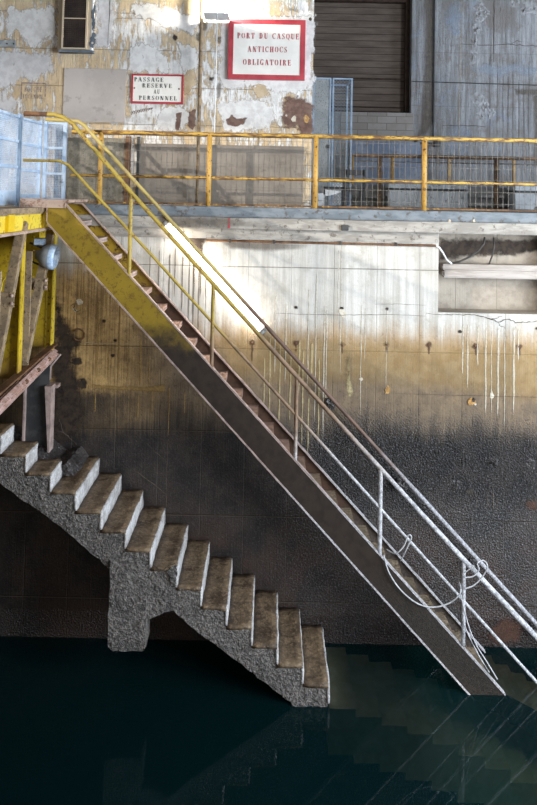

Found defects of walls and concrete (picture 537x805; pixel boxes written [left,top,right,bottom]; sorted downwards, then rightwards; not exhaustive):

peeling [0,5,59,113]
peeling [89,0,116,48]
peeling [128,3,200,75]
peeling [217,13,316,94]
peeling [153,105,189,132]
rust [226,115,247,127]
peeling [217,98,277,132]
crack [368,304,536,327]
water stain [52,294,170,441]
water stain [263,279,327,452]
water stain [347,344,365,411]
efflorescence [462,326,519,421]